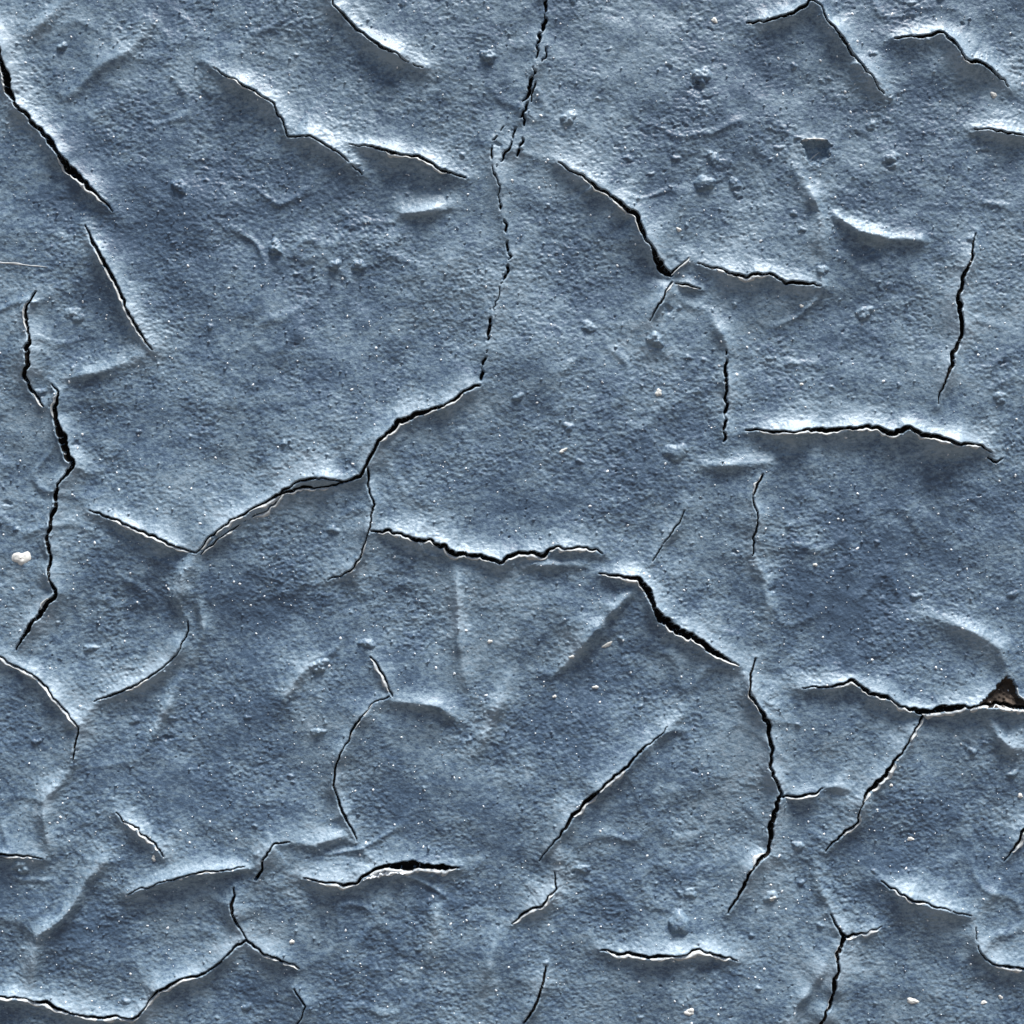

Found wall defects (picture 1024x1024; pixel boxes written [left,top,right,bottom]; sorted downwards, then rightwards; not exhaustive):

crack [743,0,1013,100]
crack [716,228,1006,468]
crack [0,0,827,926]
crack [0,808,314,1024]
crack [794,672,1024,855]
spalling [977,676,1024,708]
crack [1000,817,1024,864]